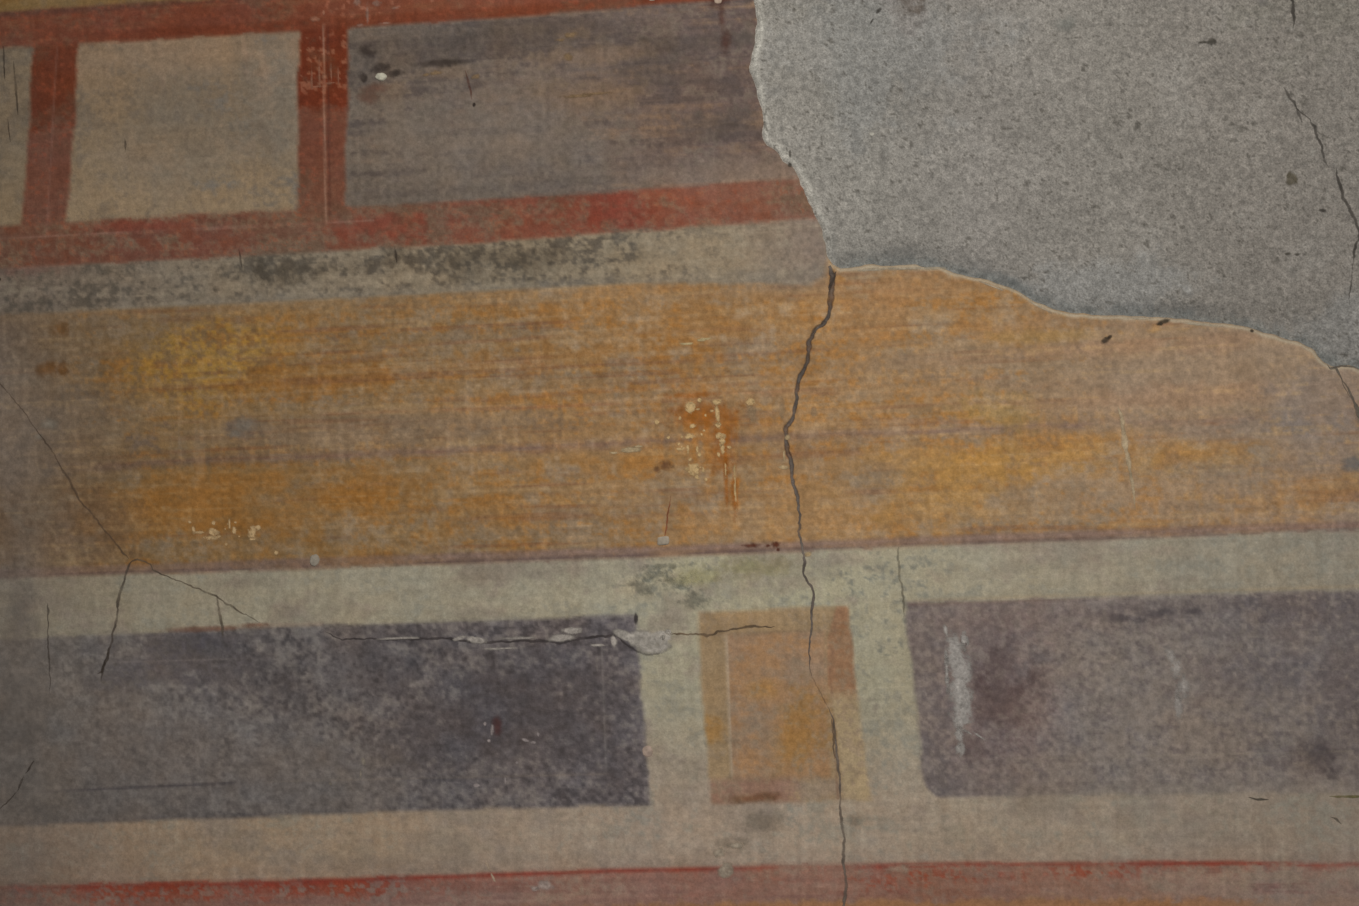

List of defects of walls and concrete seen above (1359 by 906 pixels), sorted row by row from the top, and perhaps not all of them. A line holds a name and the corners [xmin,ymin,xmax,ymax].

flaking render [749,0,1359,369]
crack [778,265,836,676]
crack [99,551,243,675]
crack [331,634,632,648]
crack [673,625,775,637]
crack [828,707,848,906]